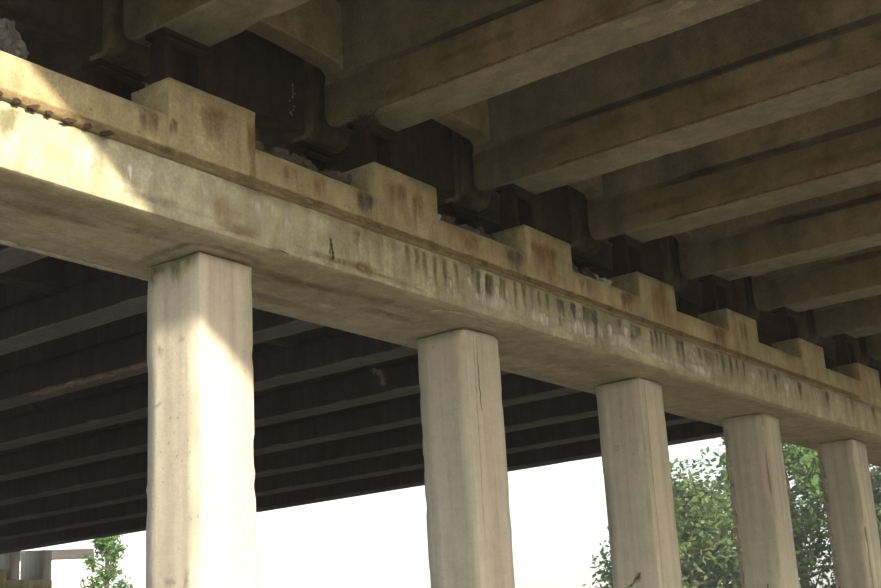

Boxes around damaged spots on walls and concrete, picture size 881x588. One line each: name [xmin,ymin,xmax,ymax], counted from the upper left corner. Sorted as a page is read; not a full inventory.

water stain [0,87,858,401]